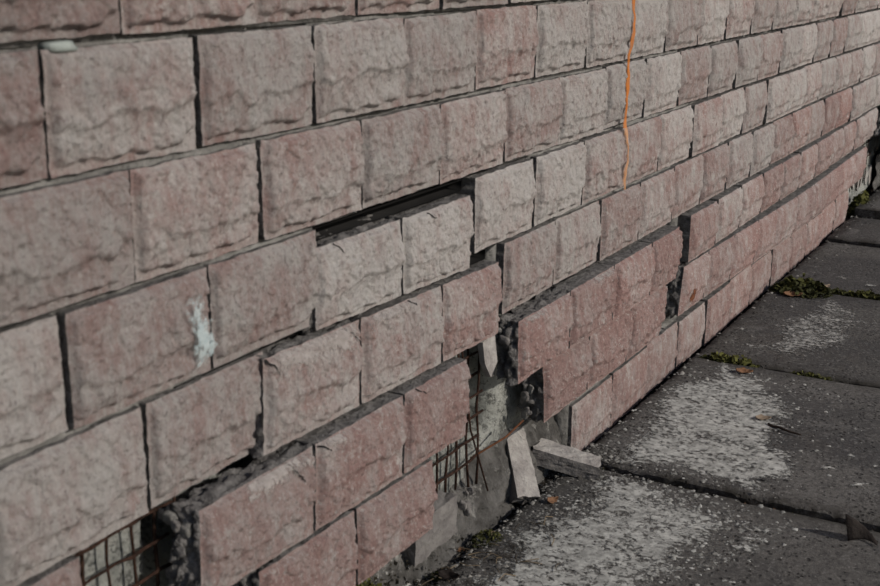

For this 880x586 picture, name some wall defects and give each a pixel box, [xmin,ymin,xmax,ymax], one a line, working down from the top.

rust [623,0,636,190]
spalling [428,327,536,517]
spalling [72,496,192,586]